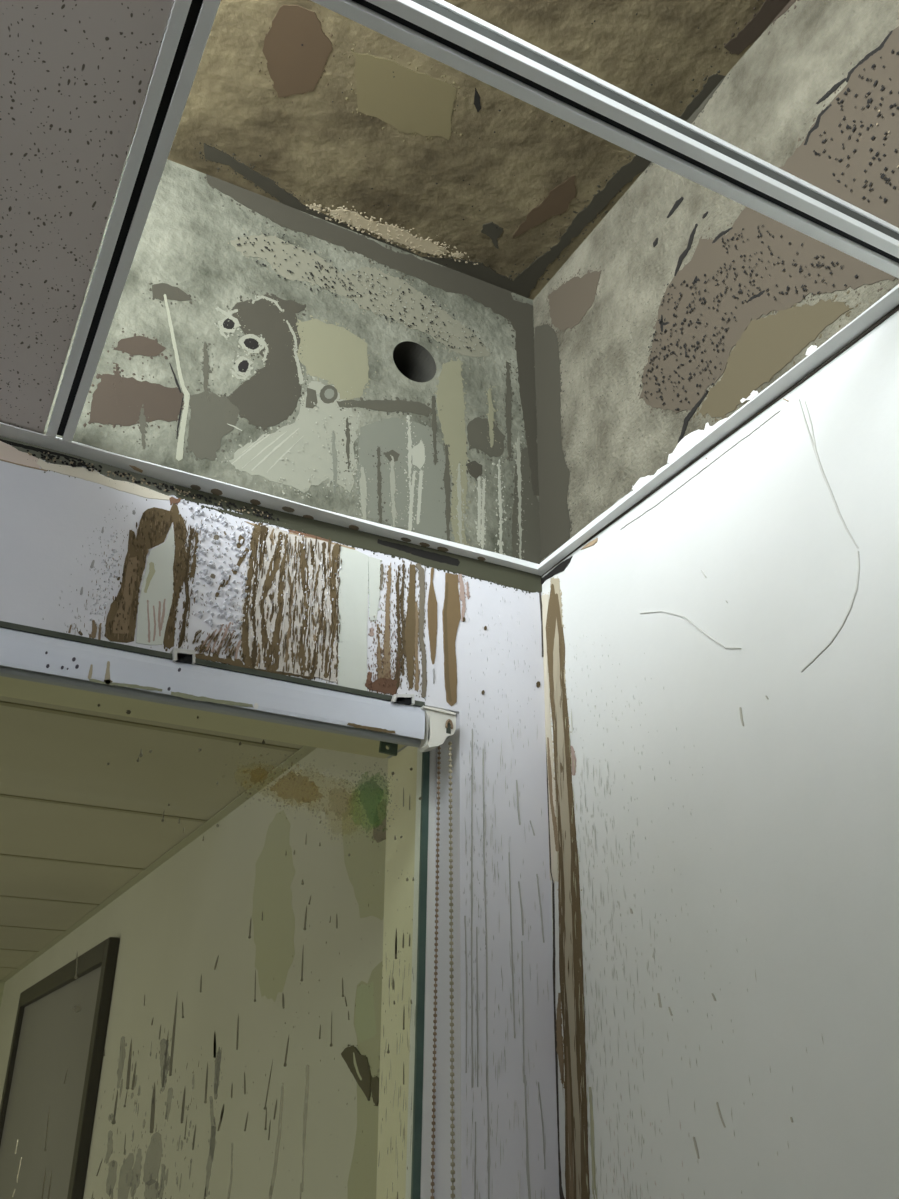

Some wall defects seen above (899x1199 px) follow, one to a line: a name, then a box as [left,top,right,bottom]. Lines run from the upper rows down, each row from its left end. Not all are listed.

leakage [678,66,730,125]
leakage [693,290,861,426]
corrosion [142,599,166,643]
corrosion [401,537,449,552]
corrosion [458,574,470,622]
leakage [252,810,296,1002]
leakage [342,786,387,920]
leakage [463,576,694,1199]
flaking render [341,1044,379,1106]
leakage [354,961,383,1077]
leakage [347,1083,379,1199]